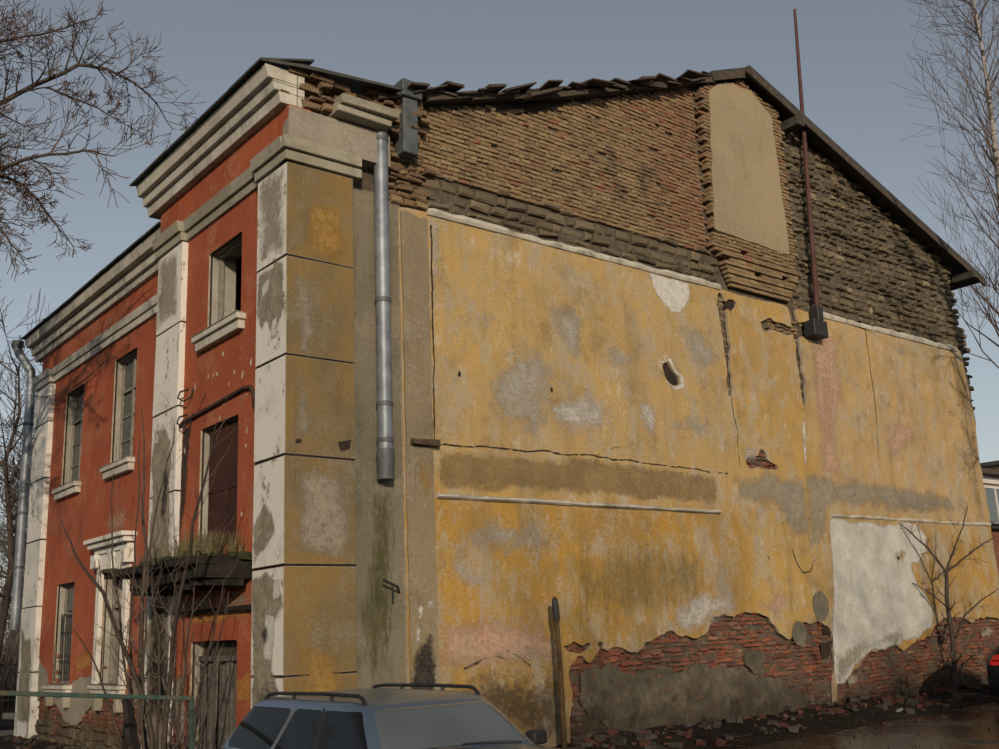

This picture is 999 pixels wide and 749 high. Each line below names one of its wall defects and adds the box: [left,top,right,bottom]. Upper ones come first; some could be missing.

peeling [257,176,283,339]
crack [430,225,740,474]
peeling [650,273,690,312]
spalling [661,358,684,390]
crack [852,325,879,450]
peeling [149,417,185,558]
peeling [253,505,274,559]
leakage [441,454,716,501]
flaking render [746,450,777,470]
peeling [17,630,31,722]
peeling [251,572,282,706]
flaking render [440,567,999,743]